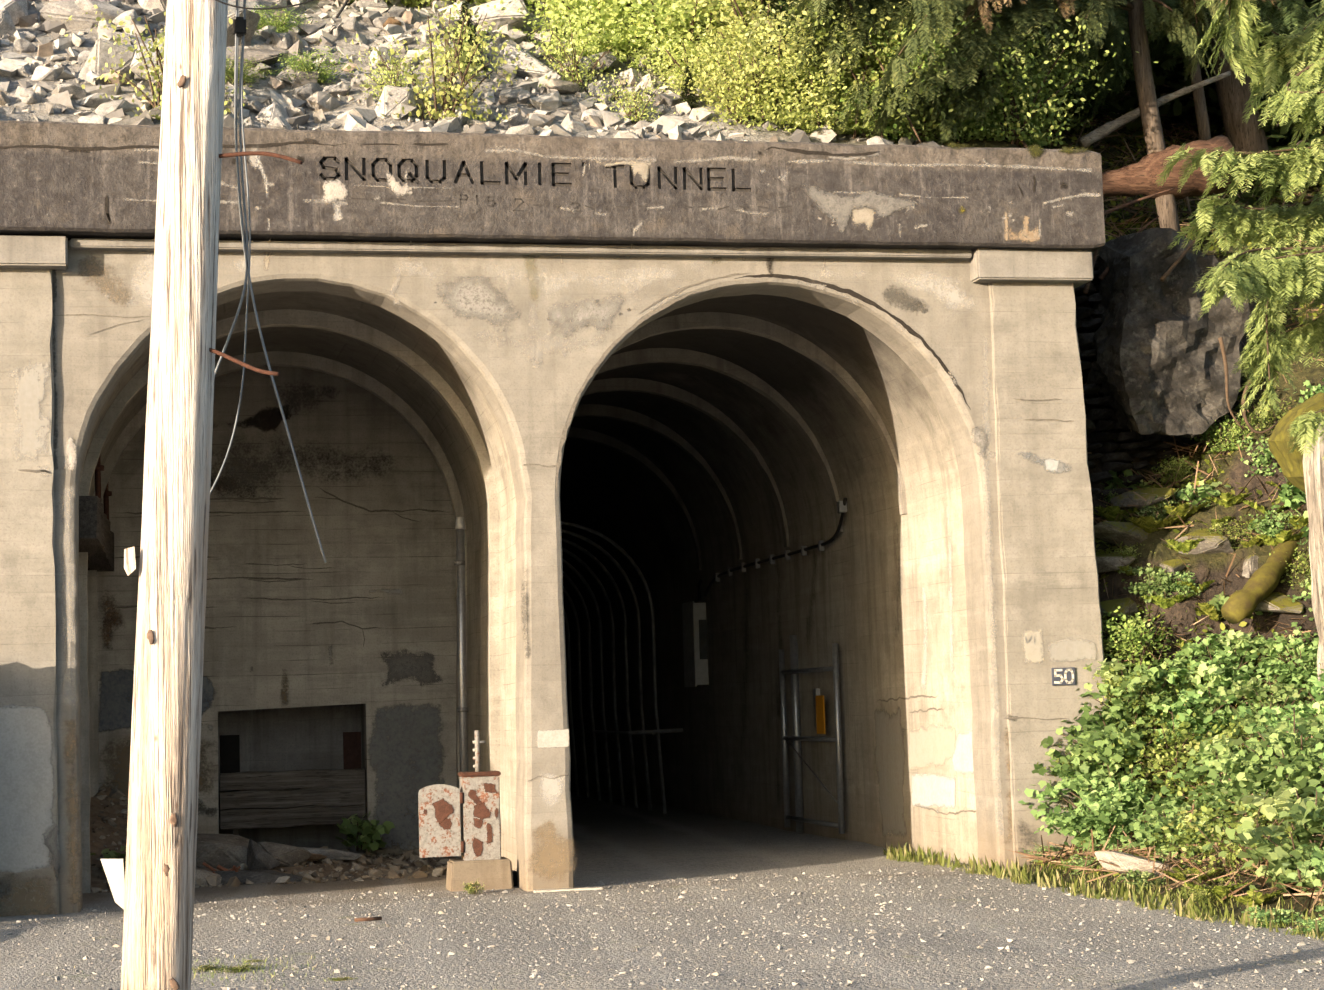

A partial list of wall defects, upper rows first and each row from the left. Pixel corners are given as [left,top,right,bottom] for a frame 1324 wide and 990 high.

spalling [304,179,348,220]
spalling [762,170,915,233]
water stain [210,382,392,497]
crack [209,486,450,522]
corrosion [102,596,122,649]
crack [205,557,385,647]